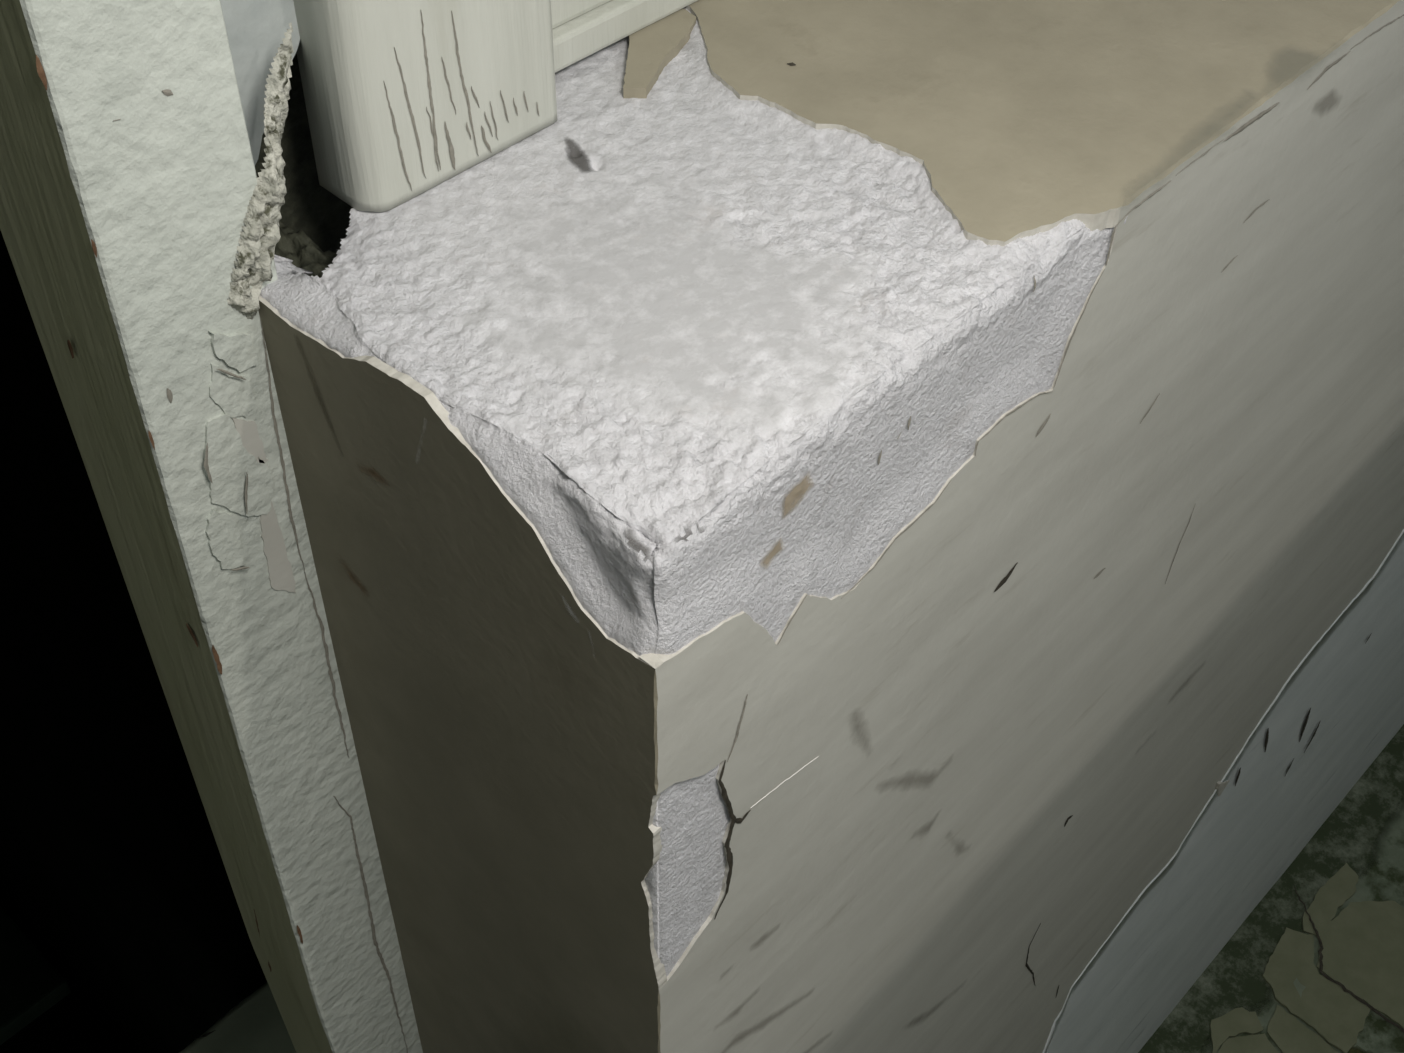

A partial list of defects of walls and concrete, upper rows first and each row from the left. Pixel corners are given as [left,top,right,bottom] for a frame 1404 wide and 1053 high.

flaking render [260,8,1128,656]
crack [260,317,350,759]
crack [334,796,408,1053]
flaking render [645,765,730,976]
crack [714,694,751,919]
crack [1025,923,1059,996]
peeling [1043,529,1404,1053]
crack [1210,863,1404,1053]